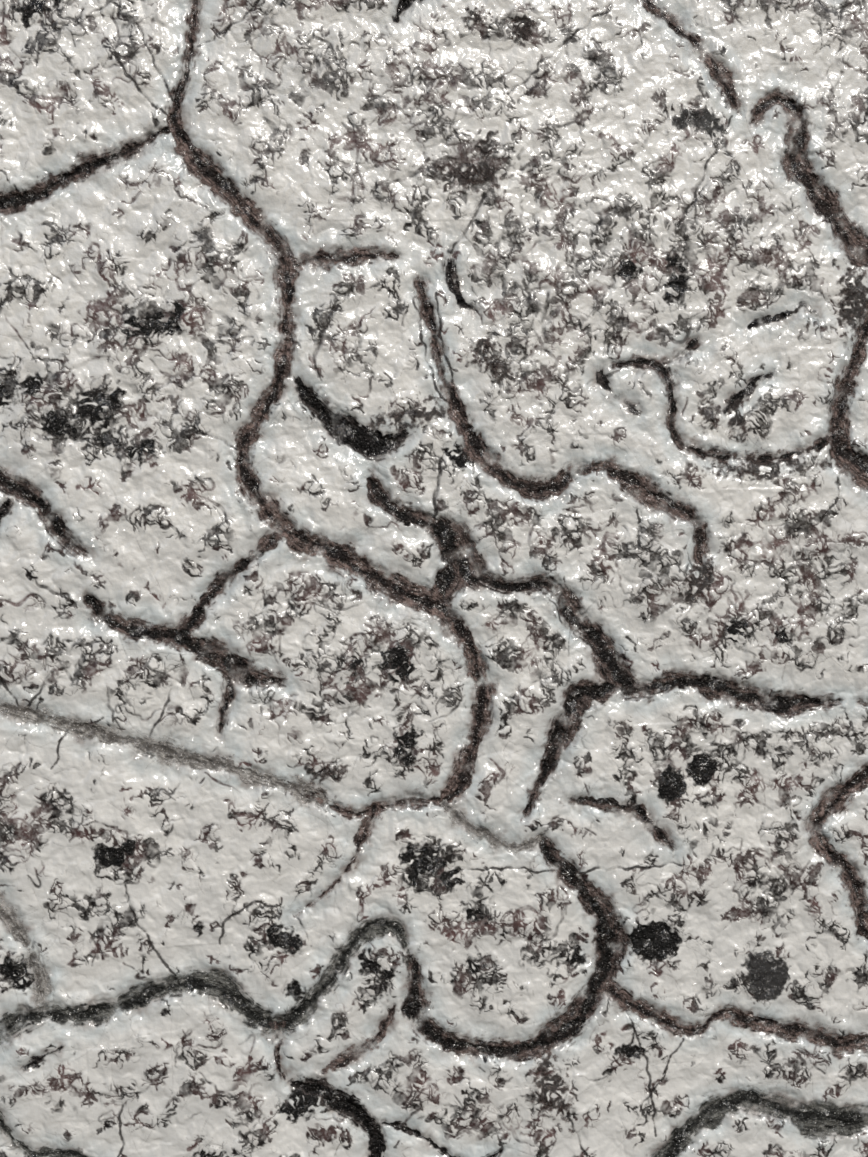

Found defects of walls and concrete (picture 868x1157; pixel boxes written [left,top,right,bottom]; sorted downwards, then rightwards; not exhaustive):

damp [835,267,868,350]
damp [41,385,163,466]
crack [0,0,868,852]
damp [658,750,718,805]
damp [398,842,465,892]
crack [806,764,868,939]
crack [0,796,868,1062]
damp [627,921,683,961]
damp [741,950,790,1001]
crack [291,1005,460,1157]
crack [0,1111,88,1157]
crack [652,1090,868,1157]